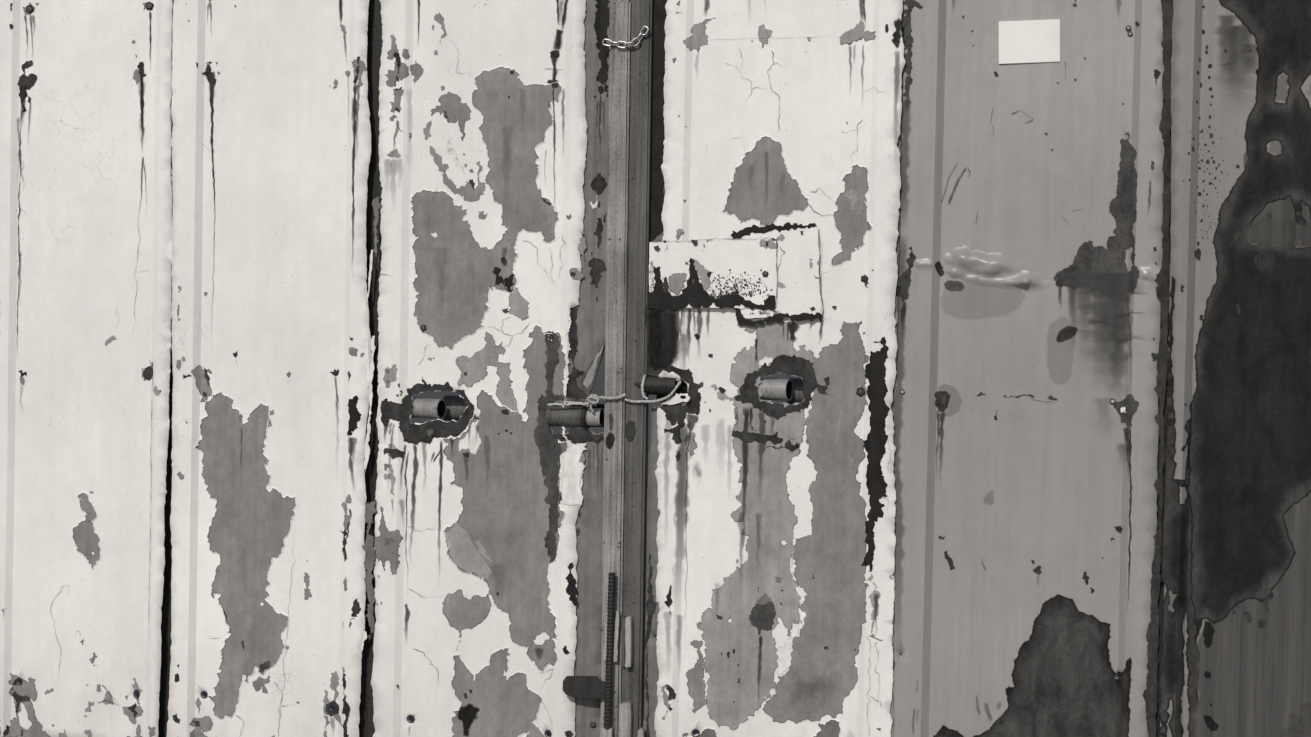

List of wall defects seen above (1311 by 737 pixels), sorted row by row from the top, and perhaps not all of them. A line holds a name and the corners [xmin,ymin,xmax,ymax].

rust [9,3,39,39]
rust [17,60,37,113]
rust [132,2,151,137]
rust [196,61,219,204]
peeling [721,135,810,249]
peeling [809,163,873,279]
peeling [176,357,297,737]
peeling [349,336,404,578]
rust [380,376,479,542]
peeling [386,35,587,737]
peeling [682,320,869,737]
rust [933,0,1311,737]